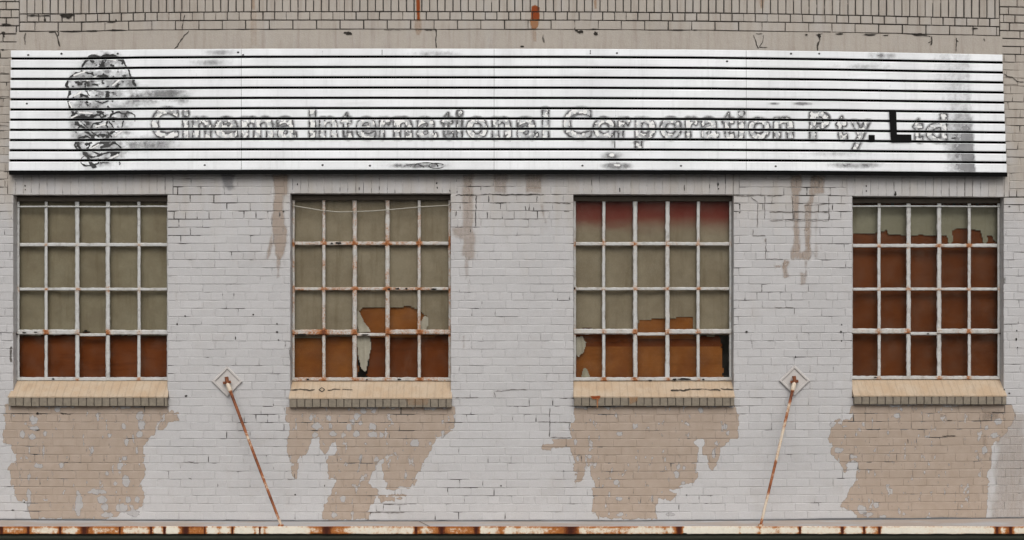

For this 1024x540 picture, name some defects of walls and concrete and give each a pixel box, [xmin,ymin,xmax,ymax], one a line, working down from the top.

corrosion [530,5,540,29]
leakage [269,175,288,258]
leakage [783,175,823,277]
peeling [2,404,179,519]
peeling [285,407,455,520]
peeling [541,405,739,520]
peeling [828,389,1016,518]